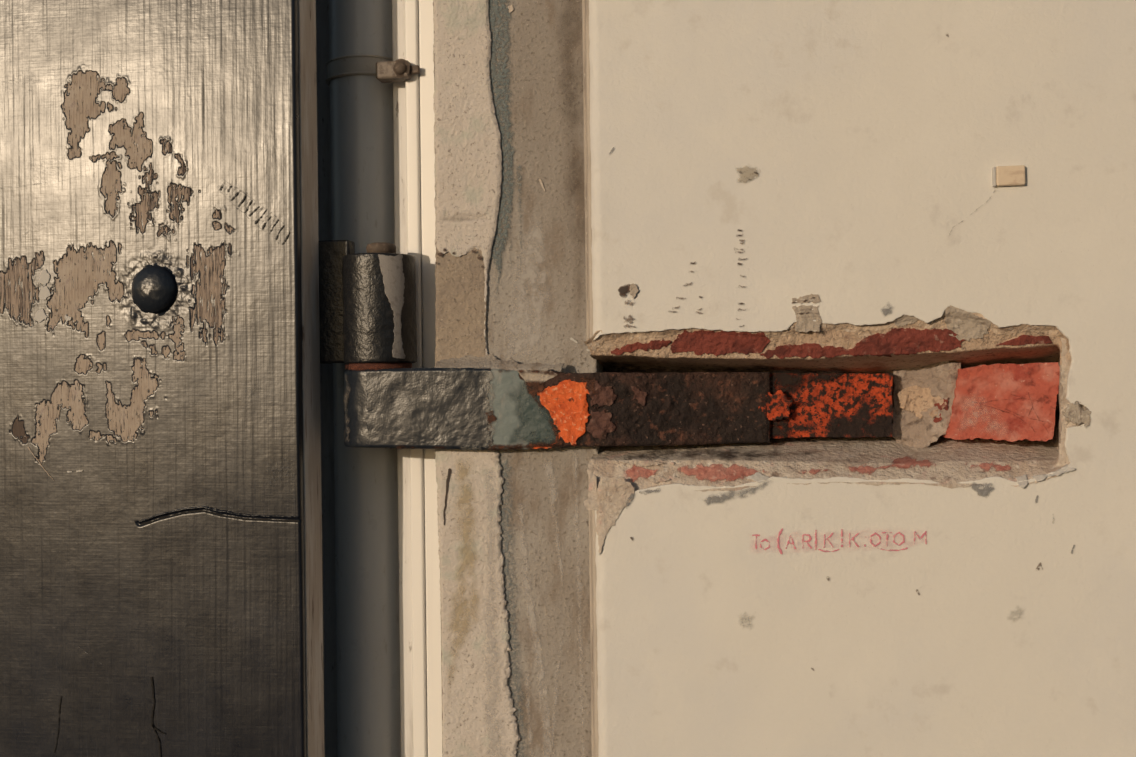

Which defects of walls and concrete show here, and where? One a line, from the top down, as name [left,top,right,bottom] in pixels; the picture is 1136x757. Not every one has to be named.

peeling [62,71,200,236]
water stain [489,0,546,353]
peeling [0,210,236,481]
flaking render [435,248,487,371]
rust [490,370,617,449]
spalling [570,294,1091,554]